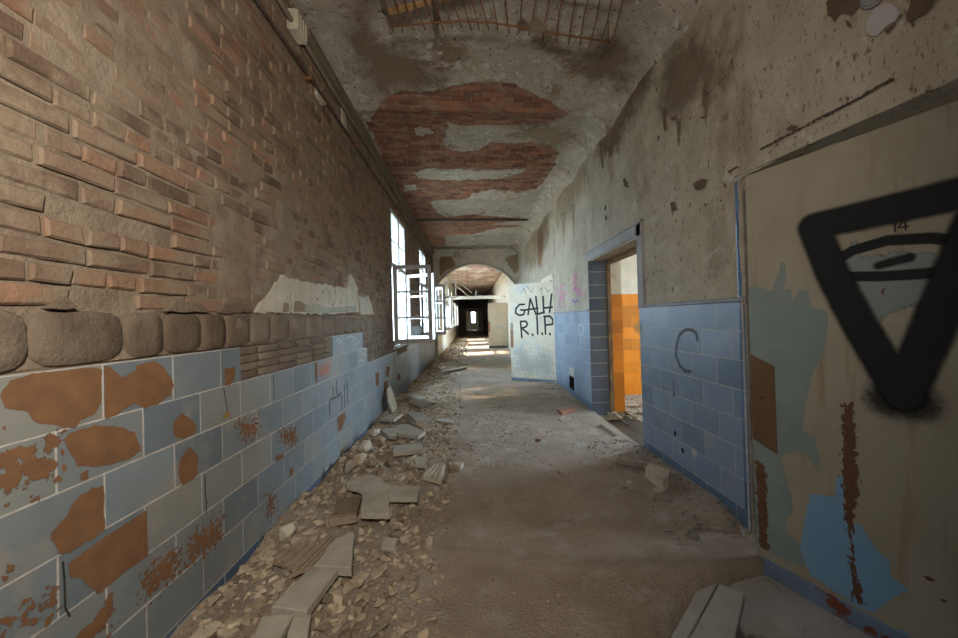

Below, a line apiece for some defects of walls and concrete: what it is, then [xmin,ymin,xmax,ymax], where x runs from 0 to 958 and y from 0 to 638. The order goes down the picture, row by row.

flaking render [826,0,860,28]
flaking render [865,0,935,36]
crack [760,78,895,150]
flaking render [0,0,570,380]
peeling [754,459,771,551]
peeling [838,401,867,605]